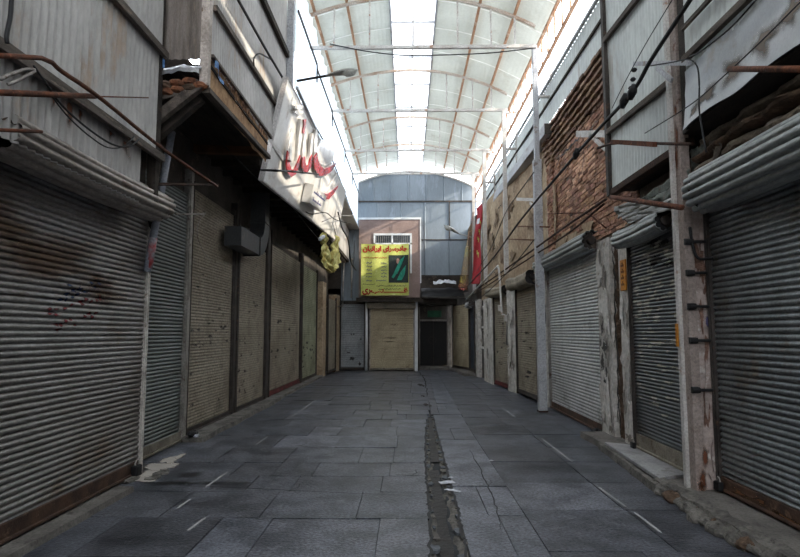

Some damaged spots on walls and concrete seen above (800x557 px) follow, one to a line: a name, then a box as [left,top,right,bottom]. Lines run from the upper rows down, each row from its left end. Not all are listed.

peeling [552,183,594,249]
peeling [596,249,613,433]
crack [396,373,469,557]
crack [469,449,501,529]
rust [699,448,708,491]